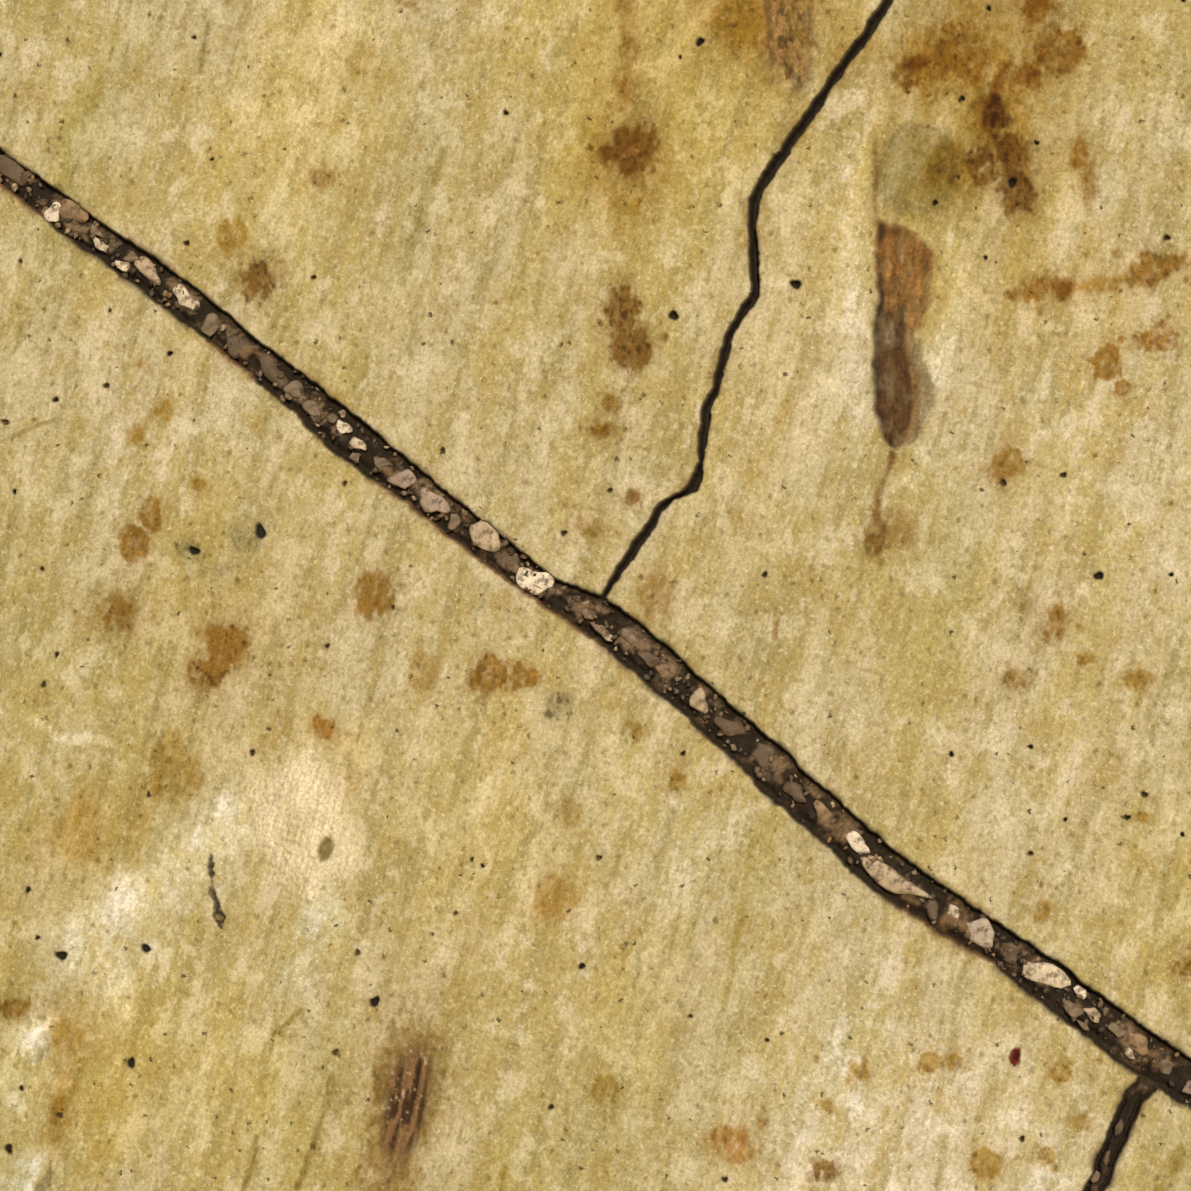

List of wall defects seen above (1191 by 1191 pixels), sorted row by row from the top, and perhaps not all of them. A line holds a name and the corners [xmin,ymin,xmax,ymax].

corrosion [674,0,805,148]
corrosion [802,0,1191,406]
corrosion [529,0,725,448]
crack [157,290,173,304]
crack [430,513,449,521]
crack [643,669,654,681]
crack [674,673,692,688]
crack [754,766,766,782]
crack [1018,955,1029,965]
crack [1115,1119,1124,1136]
crack [1102,1149,1111,1166]
crack [1090,1170,1100,1183]